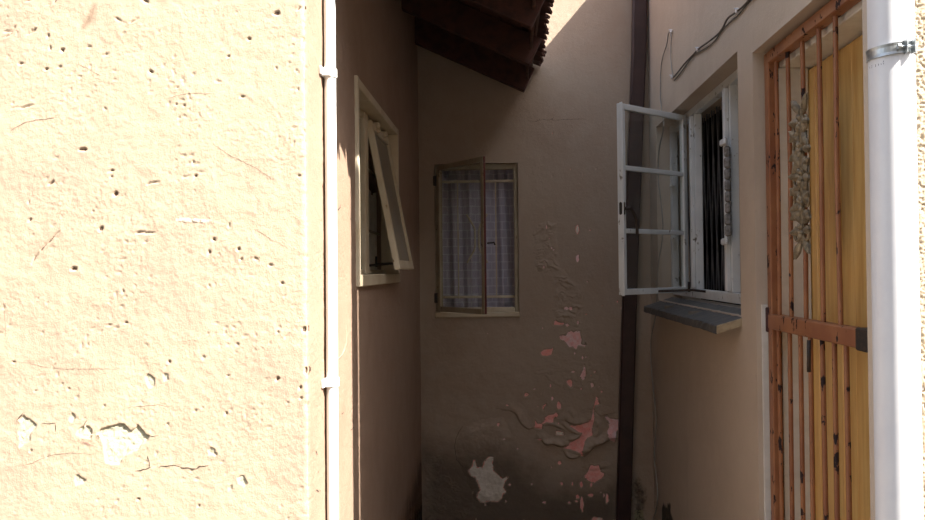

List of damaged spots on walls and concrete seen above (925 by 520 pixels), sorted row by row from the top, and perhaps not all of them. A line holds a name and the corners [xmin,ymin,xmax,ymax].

peeling [534,321,618,456]
flaking render [18,416,36,446]
flaking render [71,414,149,462]
crack [138,435,208,471]
peeling [468,457,511,505]
peeling [560,465,604,520]